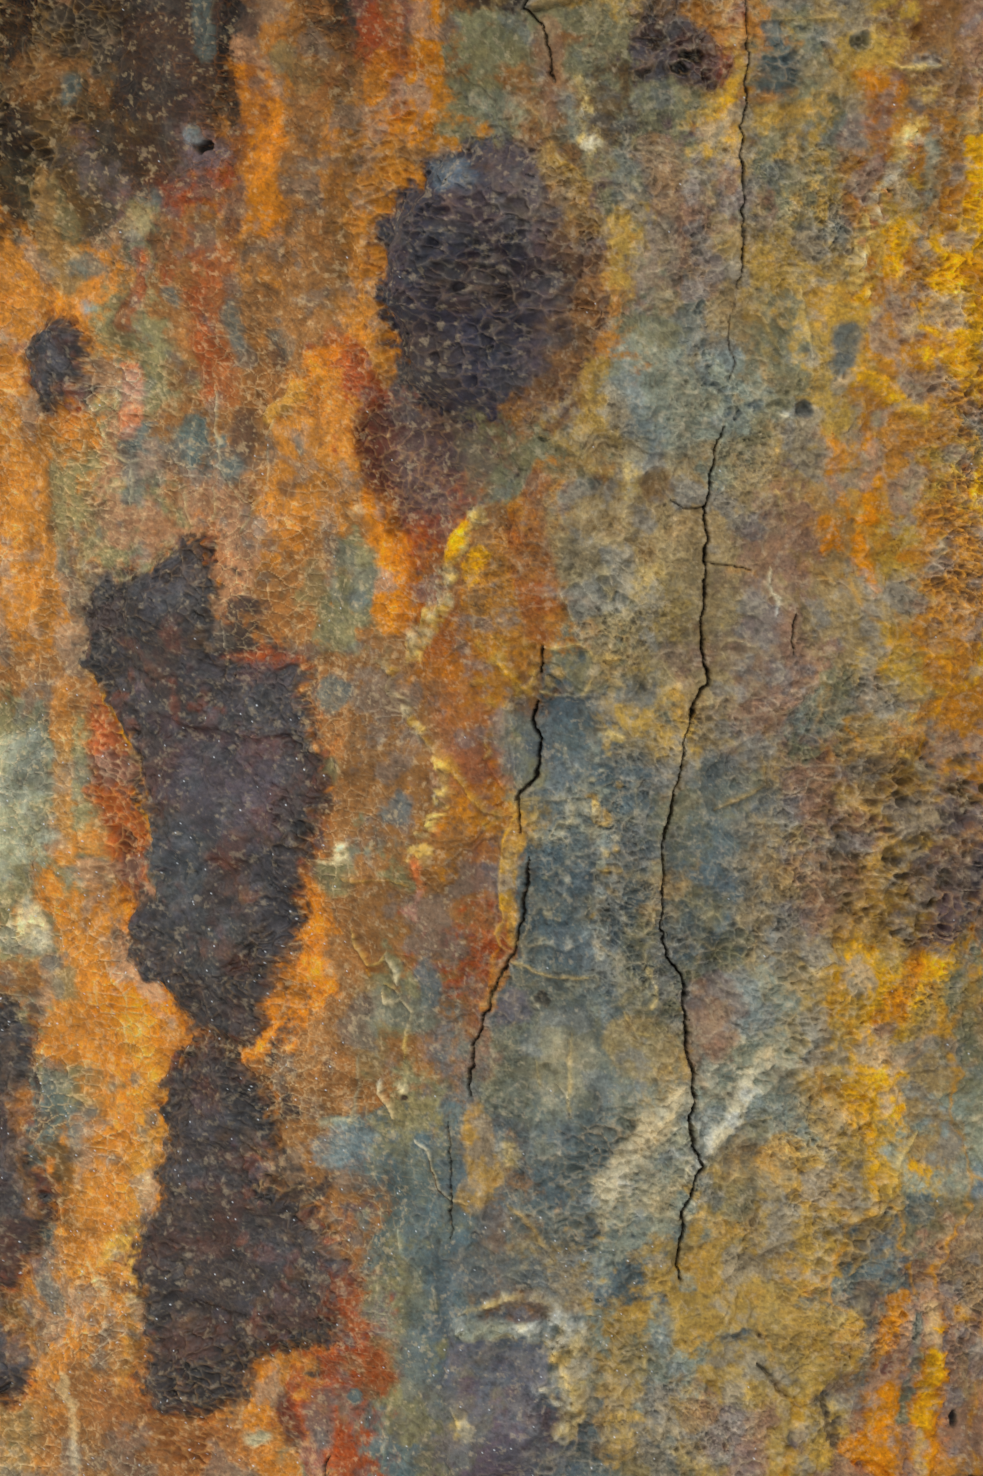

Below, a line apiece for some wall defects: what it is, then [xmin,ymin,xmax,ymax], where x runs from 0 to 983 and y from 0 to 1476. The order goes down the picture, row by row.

crack [725,0,752,382]
corrosion [882,133,983,345]
corrosion [803,417,908,599]
corrosion [967,467,983,523]
crack [427,645,546,1241]
crack [659,424,754,1285]
corrosion [317,1253,402,1467]
corrosion [838,1288,961,1476]